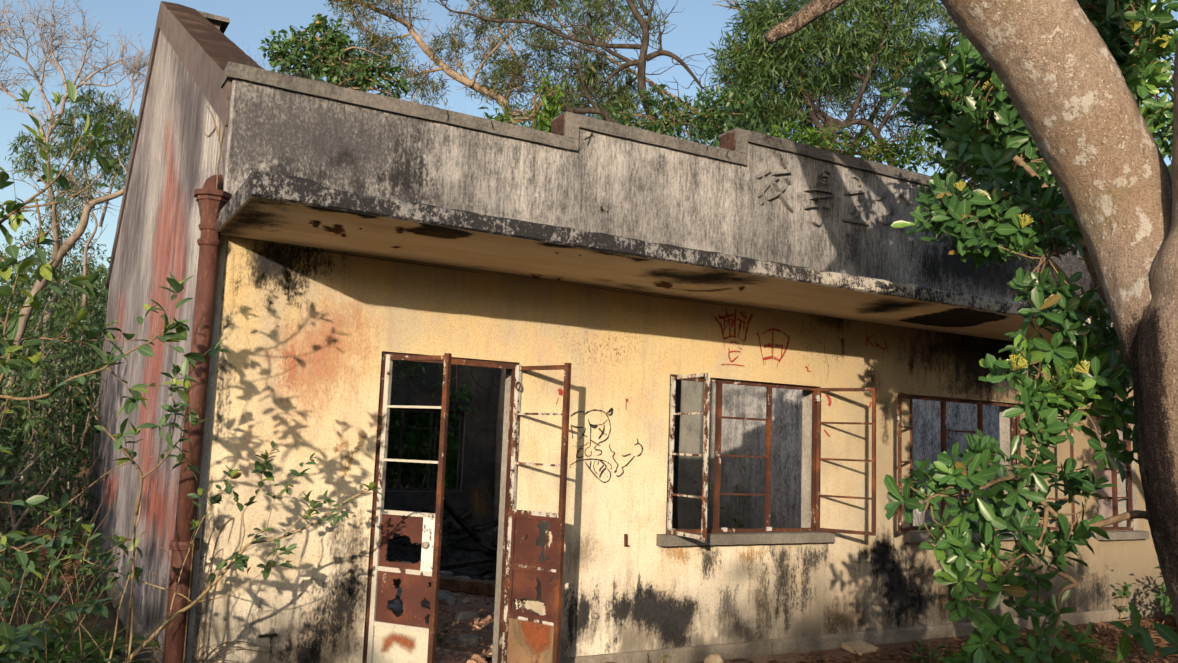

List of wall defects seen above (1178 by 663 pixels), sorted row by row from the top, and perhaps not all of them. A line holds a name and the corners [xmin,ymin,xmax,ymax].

leakage [174,57,434,300]
spalling [309,221,347,237]
leakage [406,222,472,239]
leakage [539,241,760,292]
flaking render [899,308,1011,328]
leakage [215,312,235,441]
rust [334,430,366,475]
leakage [297,539,365,663]
leakage [564,576,698,657]
leakage [700,547,722,579]
leakage [742,544,828,630]
leakage [864,535,969,625]